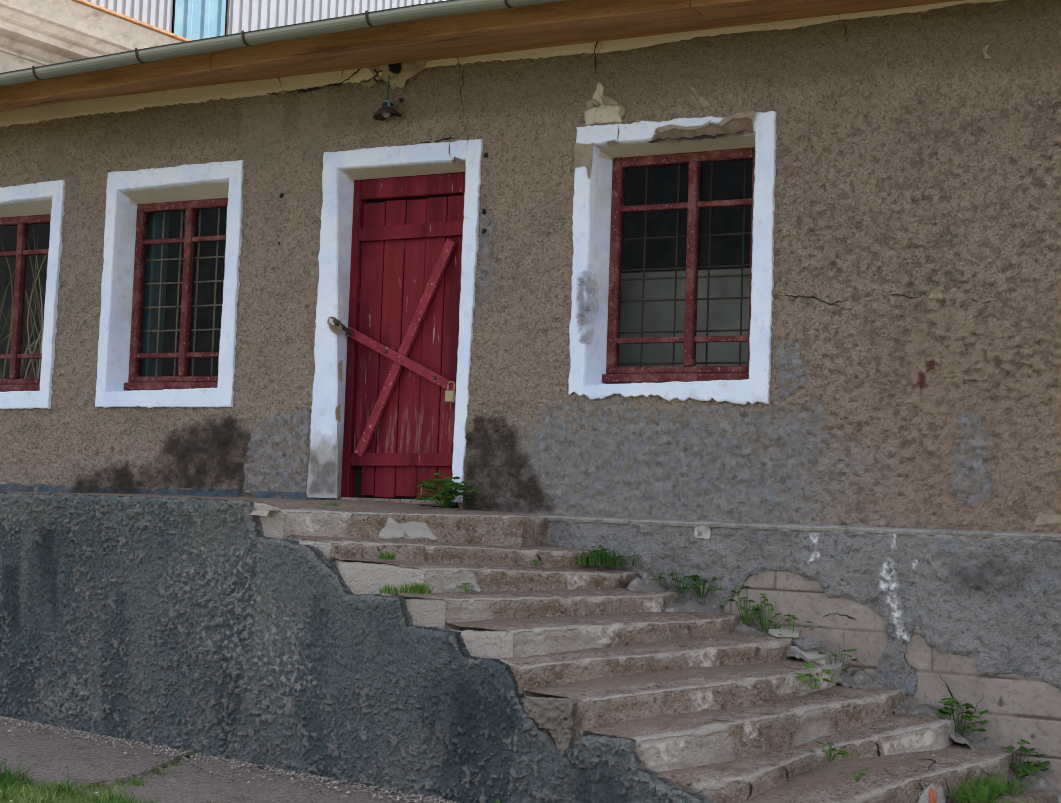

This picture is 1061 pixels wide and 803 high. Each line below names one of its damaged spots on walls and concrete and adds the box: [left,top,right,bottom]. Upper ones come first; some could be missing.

peeling [574,143,593,178]
flaking render [585,82,625,125]
spalling [648,111,755,143]
peeling [577,274,599,343]
crack [779,292,853,310]
leakage [72,408,335,493]
leakage [464,403,827,521]
spalling [721,570,888,681]
leakage [880,560,909,640]
peeling [771,673,830,693]
peeling [882,730,934,755]
spalling [905,625,1061,791]